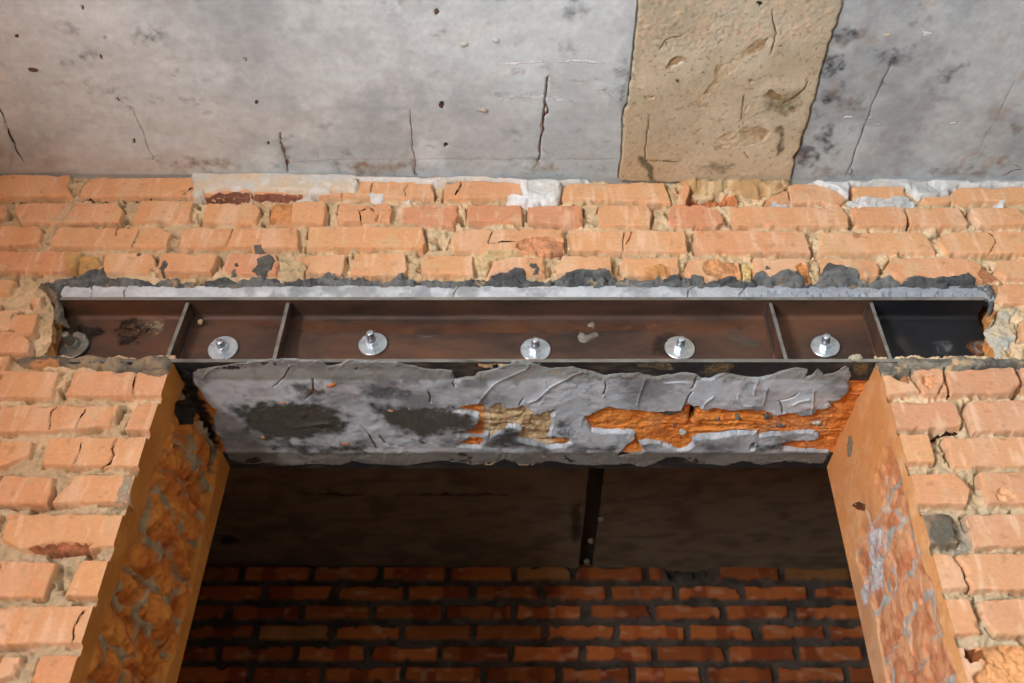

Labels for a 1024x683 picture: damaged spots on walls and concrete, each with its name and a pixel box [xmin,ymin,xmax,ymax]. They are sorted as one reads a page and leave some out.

crack [359,111,421,226]
crack [447,77,609,195]
crack [846,63,891,175]
water stain [233,384,365,453]
water stain [368,385,475,438]